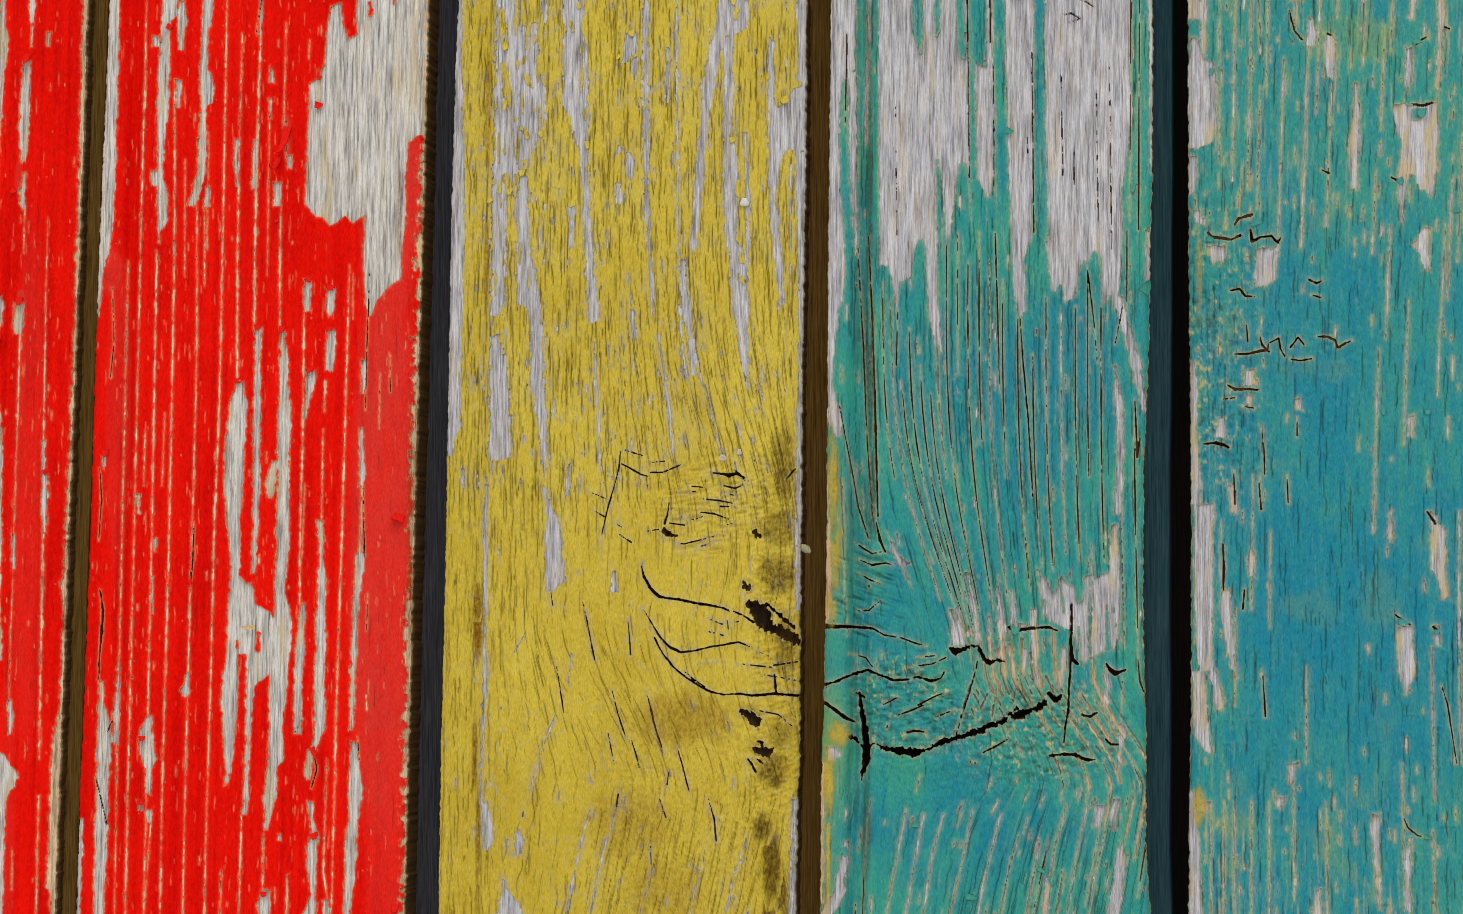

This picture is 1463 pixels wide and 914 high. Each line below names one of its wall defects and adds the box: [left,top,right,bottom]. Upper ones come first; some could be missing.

peeling [220,0,428,914]
peeling [447,0,466,489]
peeling [487,0,600,477]
peeling [690,0,807,646]
peeling [827,0,859,437]
crack [593,0,1145,780]
peeling [878,0,1153,348]
crack [1207,0,1450,298]
crack [1203,137,1463,652]
crack [522,595,595,817]
crack [565,691,742,914]
crack [855,805,1106,914]